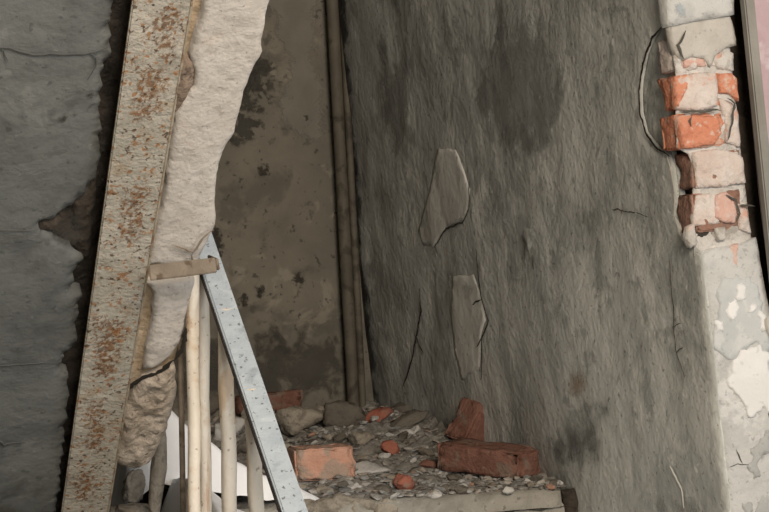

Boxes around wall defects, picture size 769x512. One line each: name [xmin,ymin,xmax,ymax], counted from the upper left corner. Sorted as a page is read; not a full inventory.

rust [153,8,180,59]
rust [132,67,166,120]
flaking render [38,162,99,258]
rust [121,186,148,241]
peeling [418,149,470,247]
flaking render [656,17,769,418]
crack [472,249,489,378]
rust [92,316,124,377]
rust [85,400,104,453]
peeling [747,430,769,479]
peeling [742,495,769,512]